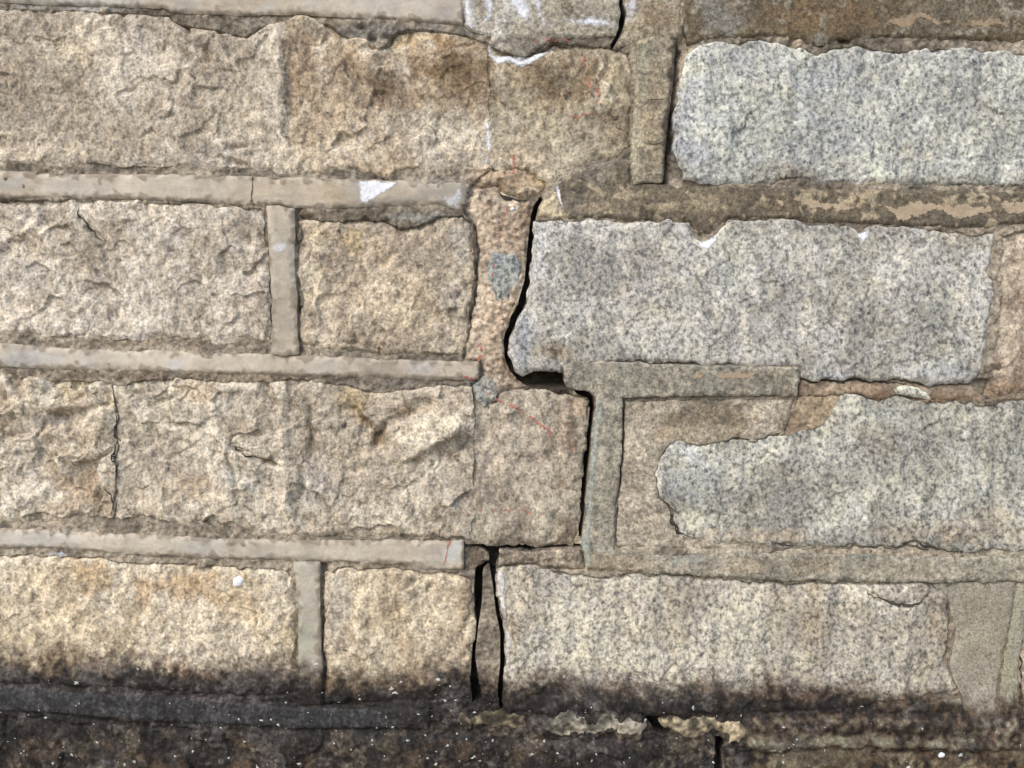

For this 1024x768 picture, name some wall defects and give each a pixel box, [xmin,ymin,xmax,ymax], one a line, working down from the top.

crack [105,409,118,517]
crack [471,192,592,698]
leakage [0,649,1024,768]